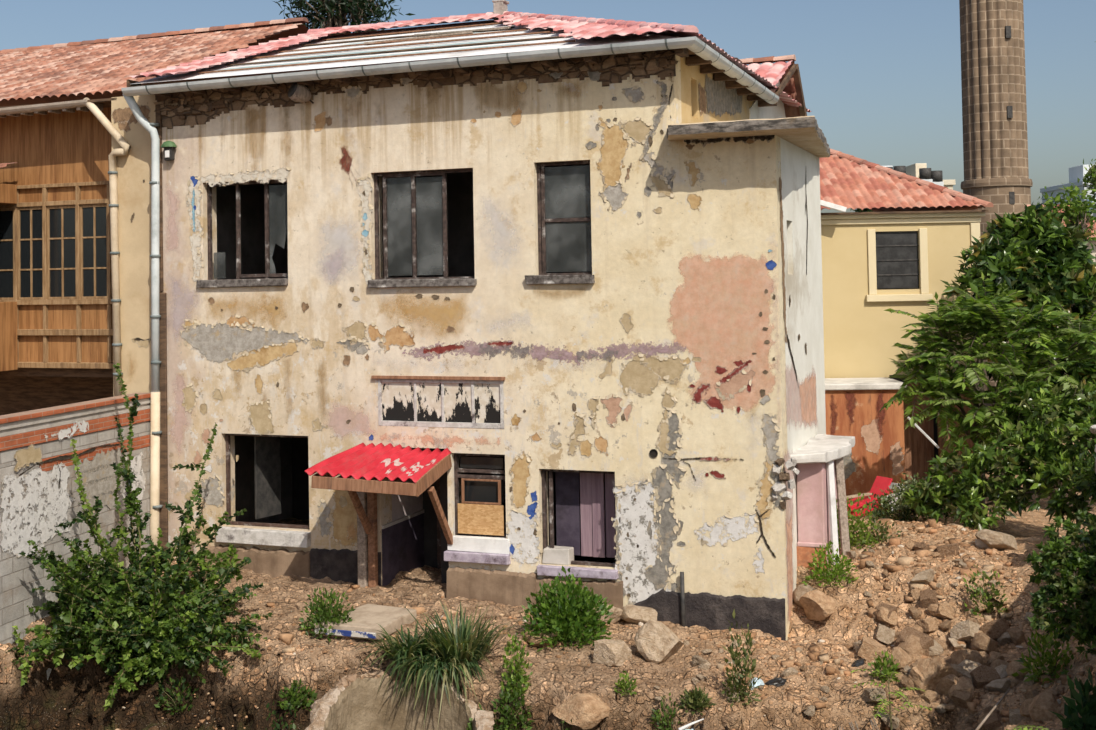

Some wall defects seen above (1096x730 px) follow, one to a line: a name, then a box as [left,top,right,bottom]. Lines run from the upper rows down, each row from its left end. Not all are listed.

flaking render [112,49,775,218]
peeling [0,420,146,558]
flaking render [179,297,415,435]
peeling [506,354,701,605]
peeling [619,313,633,334]
flaking render [716,369,800,527]
crack [754,506,776,558]
crack [787,334,799,388]
corrosion [830,392,856,434]
corrosion [876,393,885,438]